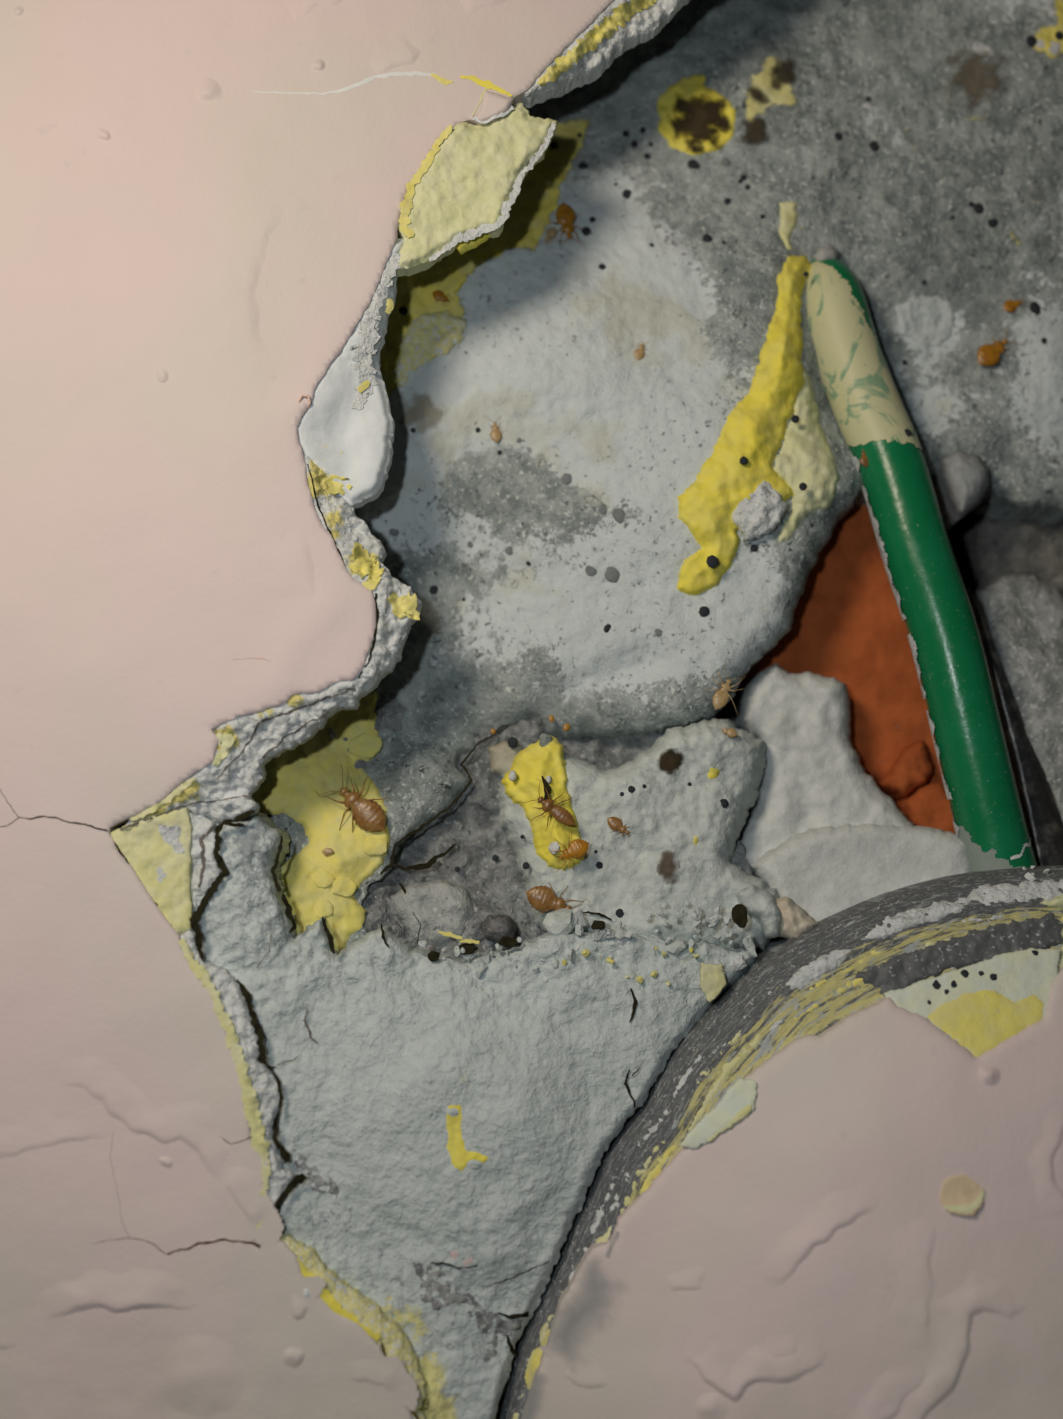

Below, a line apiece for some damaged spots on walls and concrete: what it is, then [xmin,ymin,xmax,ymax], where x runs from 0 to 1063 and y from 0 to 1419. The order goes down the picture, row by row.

leakage [672,98,765,152]
leakage [751,61,794,101]
peeling [298,238,404,509]
flaking render [354,0,1063,951]
crack [0,789,108,831]
crack [189,810,255,961]
peeling [110,672,371,935]
crack [366,721,519,946]
crack [94,1137,261,1255]
peeling [178,928,295,1207]
crack [221,836,335,1210]
flaking render [197,717,757,1419]